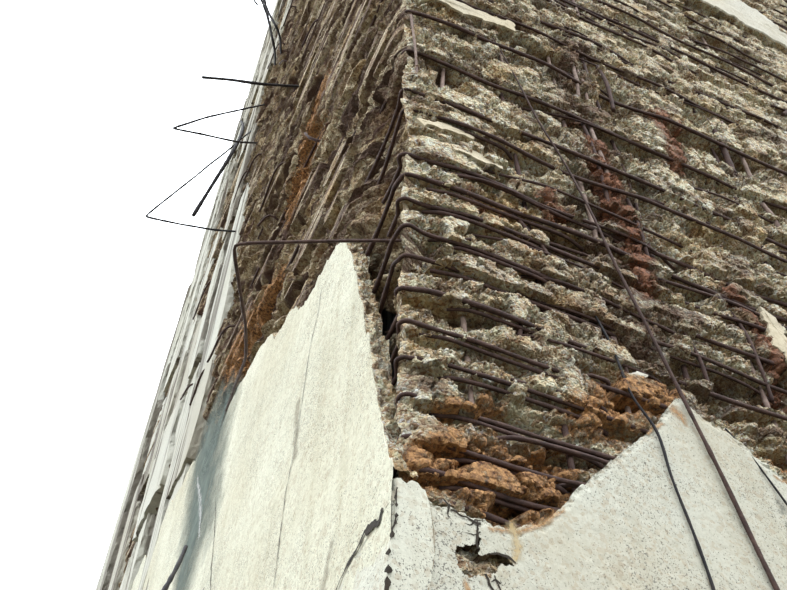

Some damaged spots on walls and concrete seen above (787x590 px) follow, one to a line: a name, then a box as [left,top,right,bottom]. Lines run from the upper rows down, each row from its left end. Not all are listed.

corrosion [283,70,331,227]
spalling [232,0,787,484]
corrosion [585,134,662,302]
corrosion [646,106,693,178]
peeling [95,143,256,590]
corrosion [220,261,290,402]
spalling [415,472,521,522]
crack [428,498,516,590]
spalling [454,543,505,578]
corrosion [399,391,585,562]